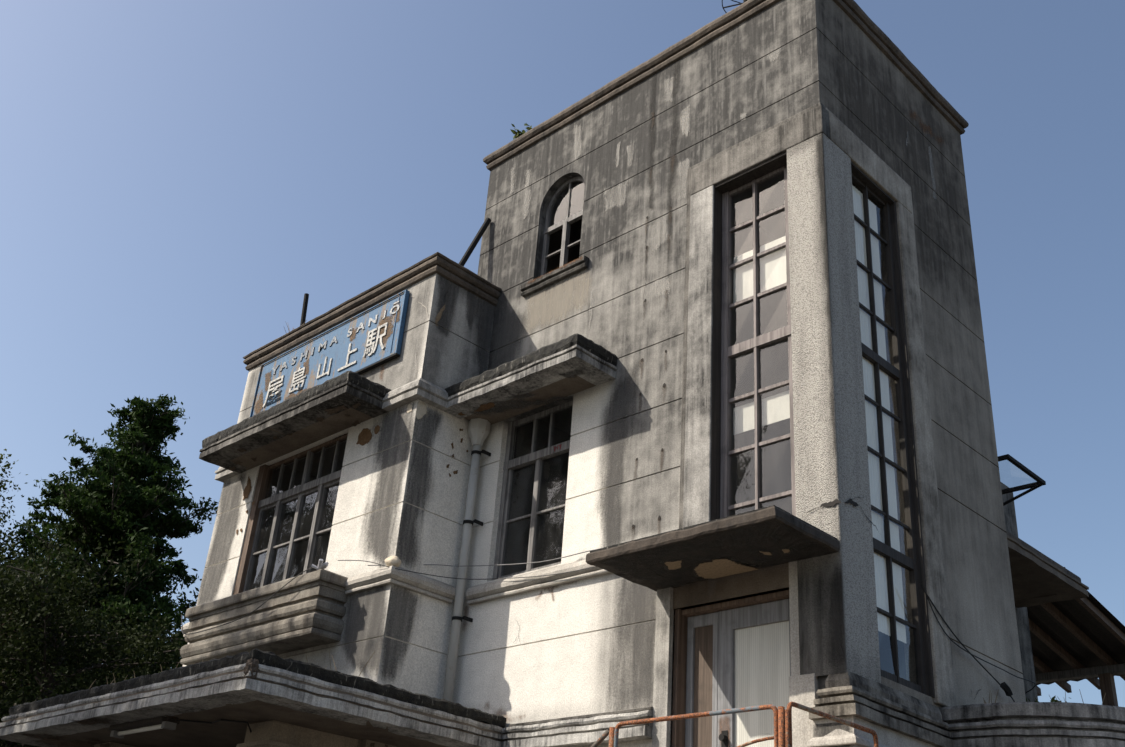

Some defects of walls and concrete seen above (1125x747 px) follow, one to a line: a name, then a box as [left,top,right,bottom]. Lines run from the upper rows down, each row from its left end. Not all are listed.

damp [649,60,689,250]
damp [438,272,593,375]
peeling [316,403,380,446]
damp [365,403,441,567]
peeling [665,559,758,579]
damp [600,364,833,711]
crack [807,497,879,532]
damp [342,585,417,679]